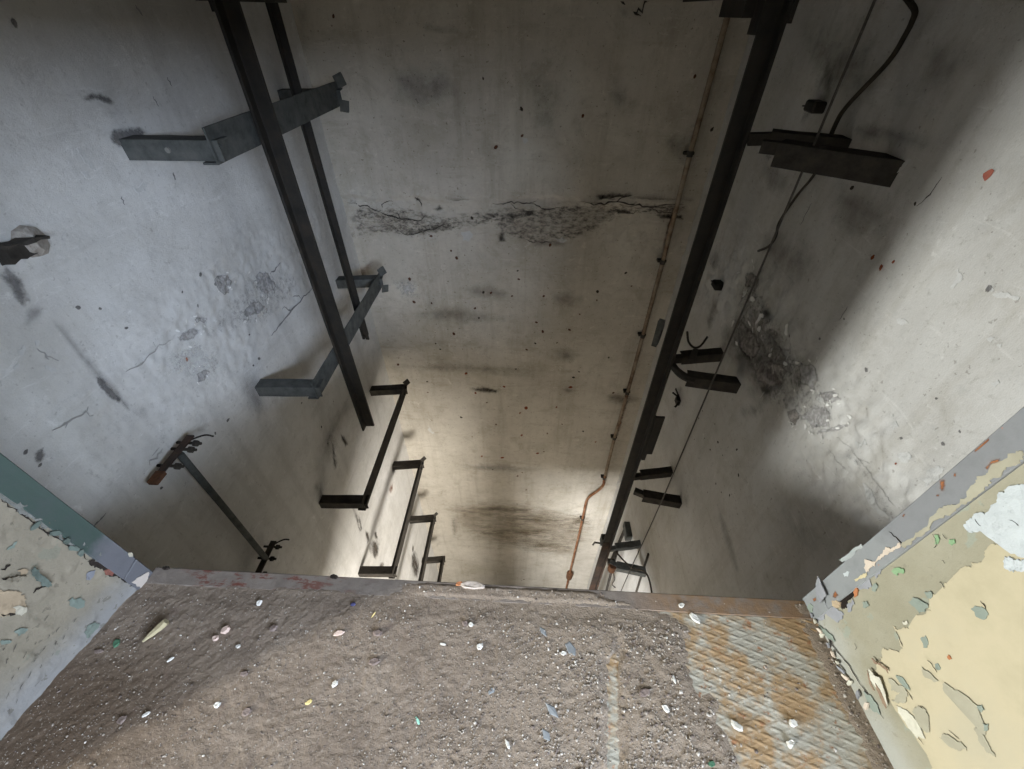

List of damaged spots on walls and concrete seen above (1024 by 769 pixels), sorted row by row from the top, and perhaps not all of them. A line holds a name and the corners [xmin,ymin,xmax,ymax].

crack [356,197,446,235]
crack [493,201,560,210]
crack [586,195,682,219]
flaking render [214,272,236,294]
flaking render [244,272,280,335]
flaking render [176,304,206,348]
flaking render [787,356,852,439]
peeling [0,590,27,617]
peeling [867,544,1024,769]